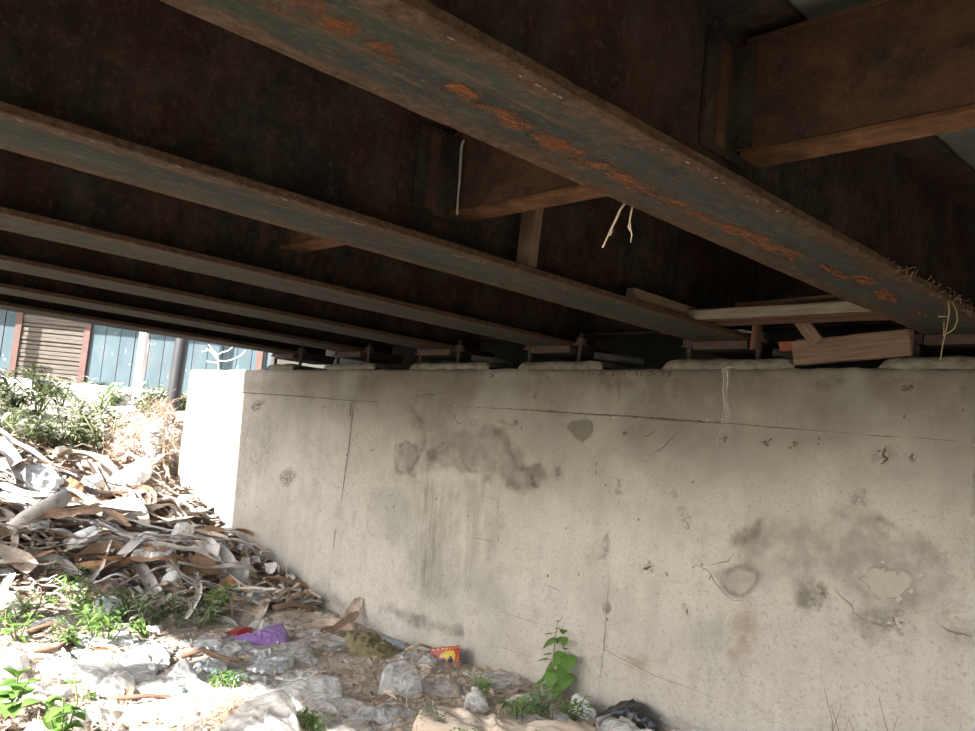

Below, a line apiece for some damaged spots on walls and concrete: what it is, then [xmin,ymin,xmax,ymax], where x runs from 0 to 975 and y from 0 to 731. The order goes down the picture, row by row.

corrosion [443,83,805,260]
corrosion [819,264,899,302]
damp [568,420,593,442]
crack [211,380,951,592]
crack [690,554,740,601]
crack [835,590,866,622]